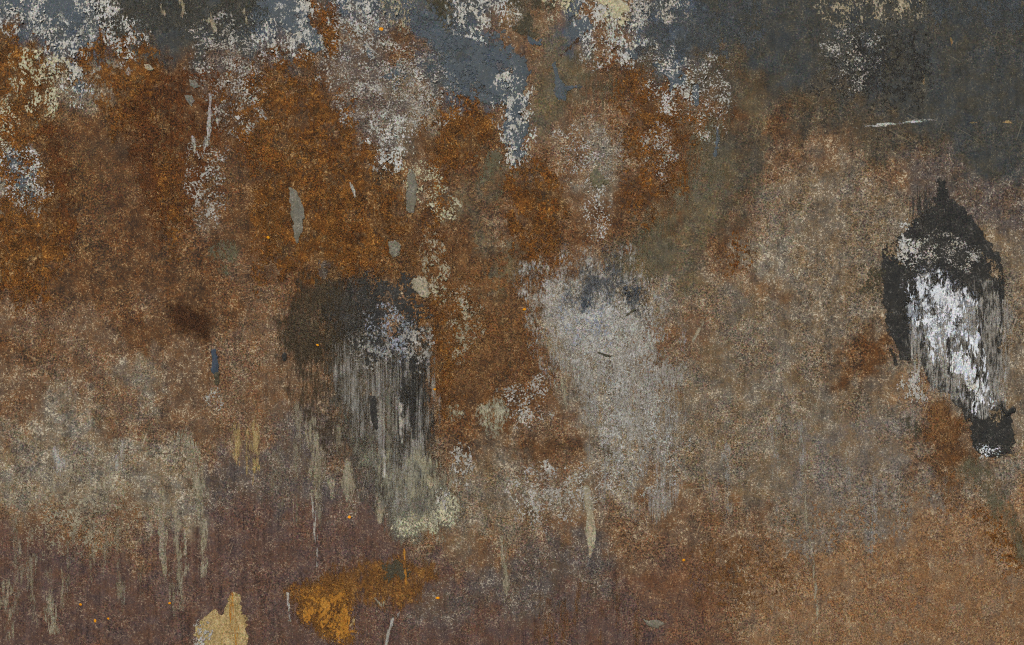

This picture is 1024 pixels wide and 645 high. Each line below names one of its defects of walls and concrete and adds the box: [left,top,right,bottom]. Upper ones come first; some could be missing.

rust [0,22,79,315]
peeling [0,0,542,370]
rust [71,25,570,419]
peeling [541,0,732,181]
rust [605,59,710,235]
damp [305,330,456,525]
damp [910,265,1010,419]
rust [677,469,1024,645]